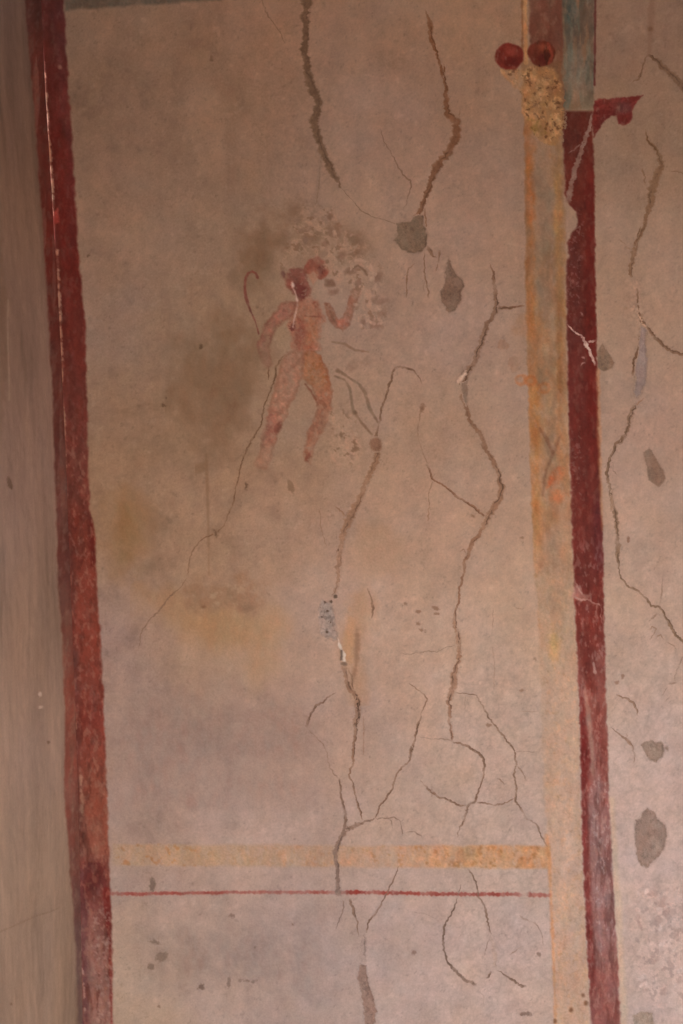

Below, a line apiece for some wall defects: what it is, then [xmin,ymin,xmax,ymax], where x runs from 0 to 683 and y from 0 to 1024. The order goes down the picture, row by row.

crack [138,354,286,649]
spalling [320,594,348,667]
peeling [276,200,393,339]
crack [261,0,463,299]
crack [305,263,548,964]
crack [604,129,683,703]
crack [630,54,683,93]
crack [412,868,544,1008]